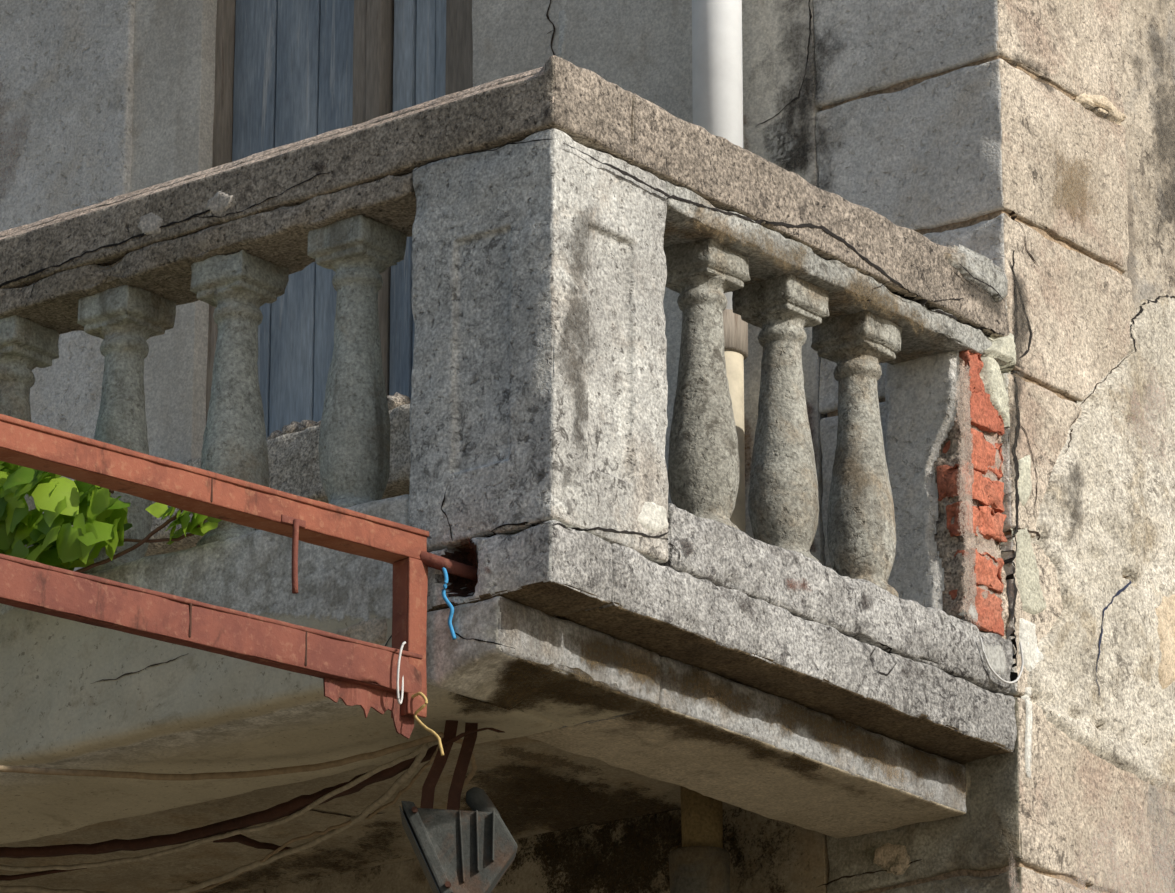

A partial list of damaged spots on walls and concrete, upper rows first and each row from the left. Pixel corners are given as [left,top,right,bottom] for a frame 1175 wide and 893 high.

crack [546,0,555,55]
water stain [764,27,841,171]
water stain [1134,38,1175,231]
crack [0,170,334,298]
crack [409,139,1041,683]
crack [1065,295,1175,453]
flaking render [936,350,1047,672]
crack [91,653,189,684]
water stain [455,636,966,795]
crack [1096,573,1137,698]
water stain [460,737,682,893]
crack [818,859,922,887]